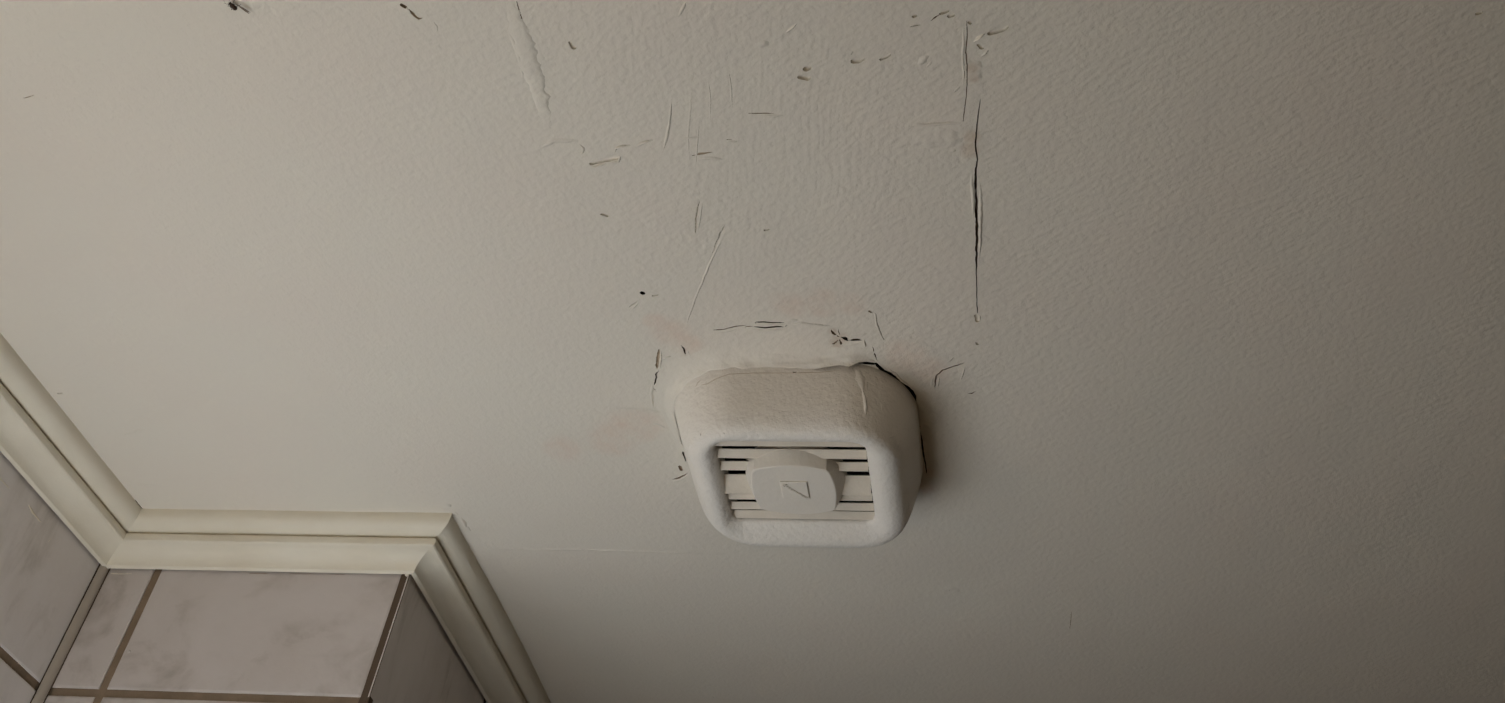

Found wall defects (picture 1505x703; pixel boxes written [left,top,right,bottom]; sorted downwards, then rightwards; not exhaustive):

crack [961,23,983,322]
crack [650,325,750,461]
crack [800,330,965,473]